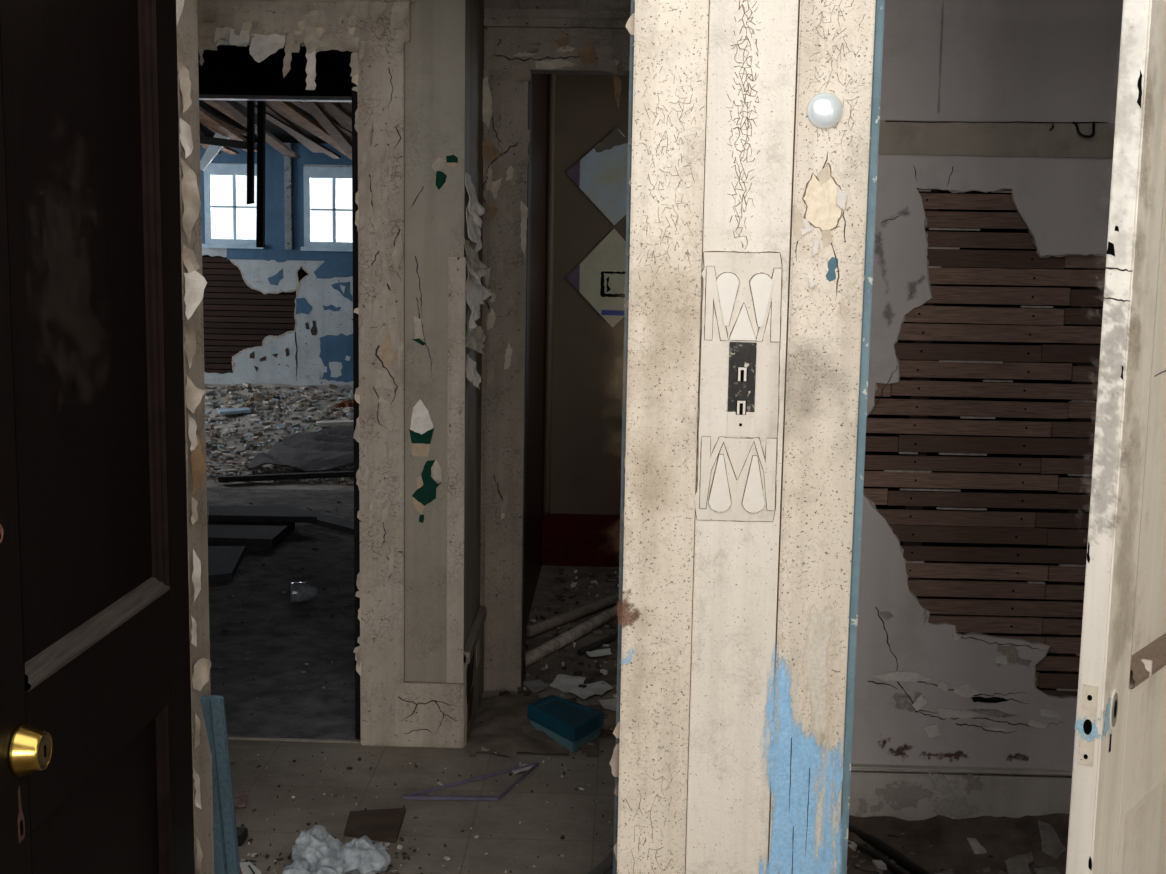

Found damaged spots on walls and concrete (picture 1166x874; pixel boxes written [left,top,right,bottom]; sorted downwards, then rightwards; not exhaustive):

spalling [176,0,366,525]
crack [357,30,407,620]
peeling [410,77,528,390]
peeling [793,152,847,319]
peeling [409,399,442,523]
spalling [863,188,1119,738]
peeling [192,549,201,602]
peeling [191,616,211,691]
crack [367,679,457,735]
peeling [609,721,620,796]
peeling [759,605,843,874]
crack [867,607,933,713]